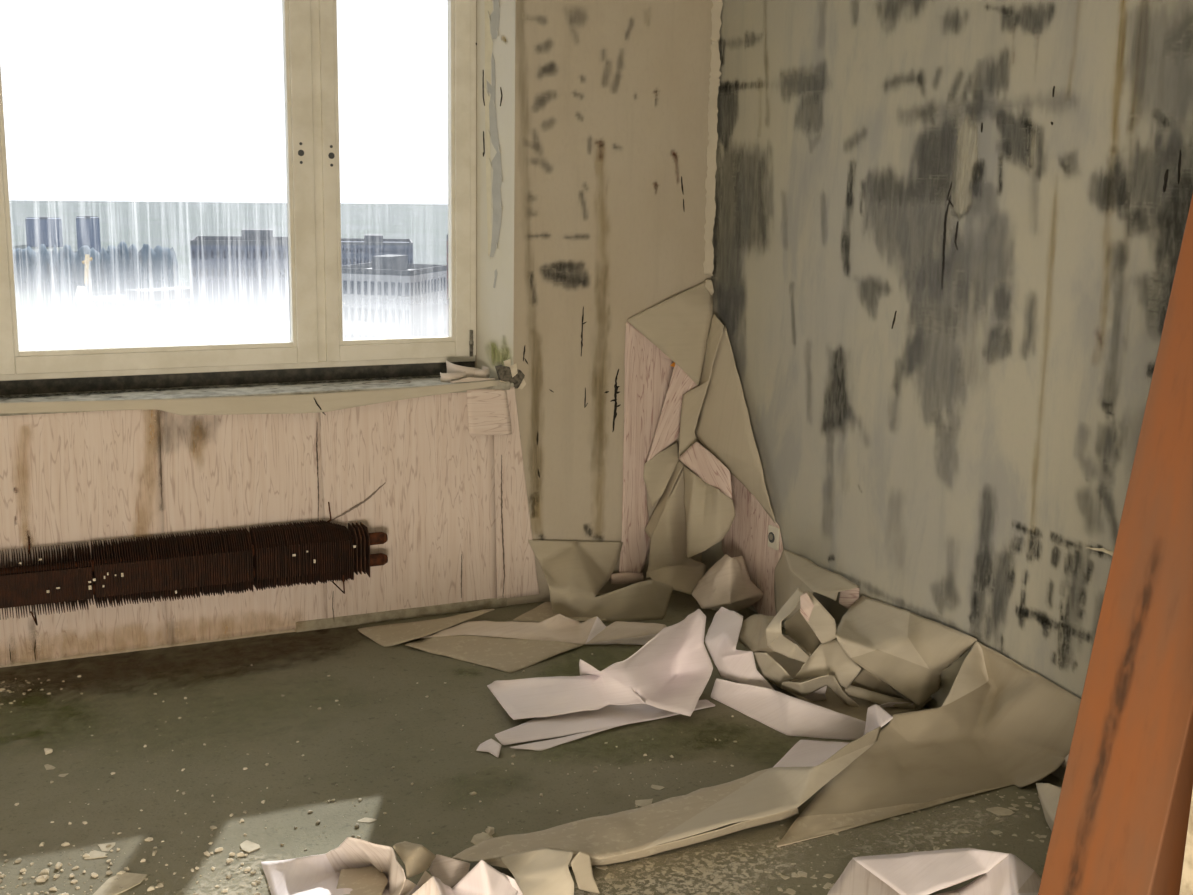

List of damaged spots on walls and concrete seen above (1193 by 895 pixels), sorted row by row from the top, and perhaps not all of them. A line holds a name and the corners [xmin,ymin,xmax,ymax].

damp [1003,5,1054,32]
peeling [476,0,503,288]
damp [713,82,764,316]
damp [867,126,969,318]
damp [972,163,984,195]
damp [997,112,1042,192]
damp [1105,141,1193,266]
damp [824,348,848,429]
damp [970,505,1090,666]